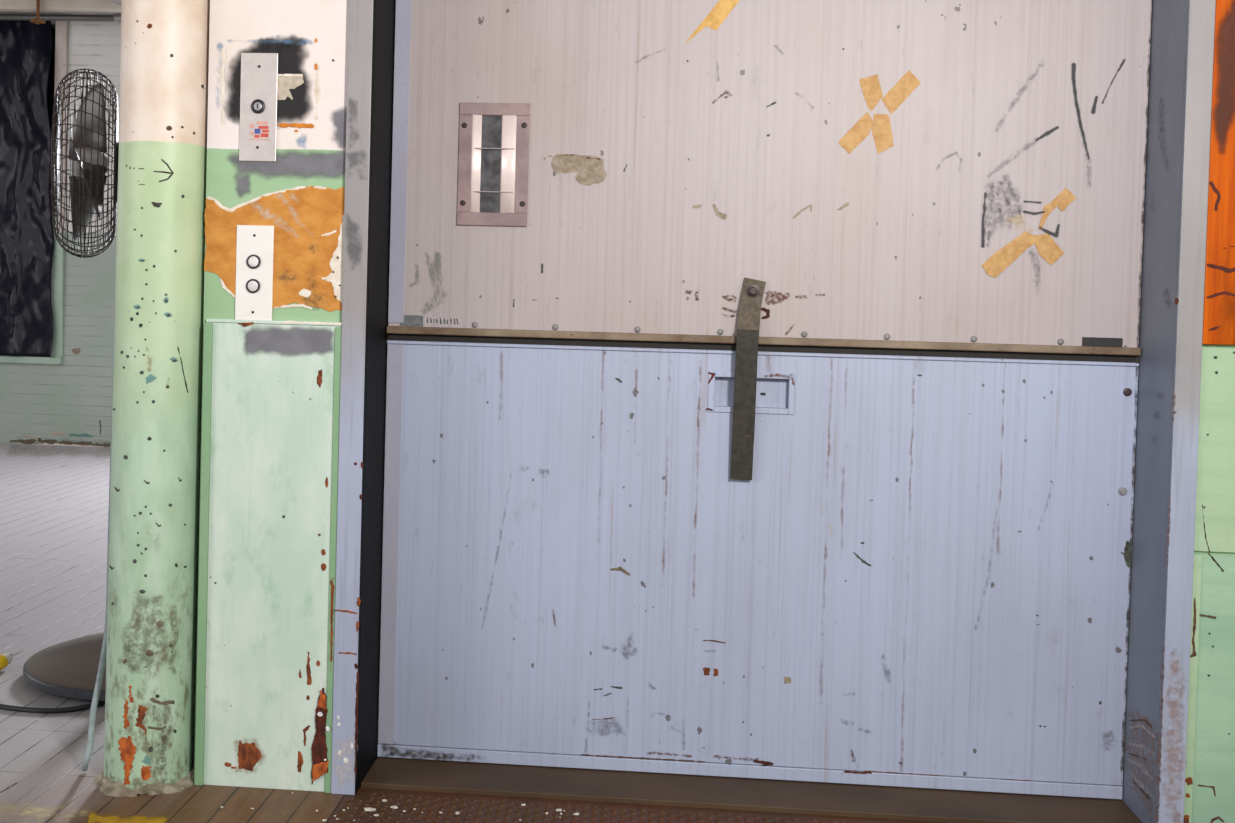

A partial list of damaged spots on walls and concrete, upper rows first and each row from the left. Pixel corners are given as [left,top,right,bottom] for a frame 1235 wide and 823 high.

peeling [204,185,345,326]
corrosion [118,686,151,786]
corrosion [224,740,262,771]
corrosion [297,580,357,784]